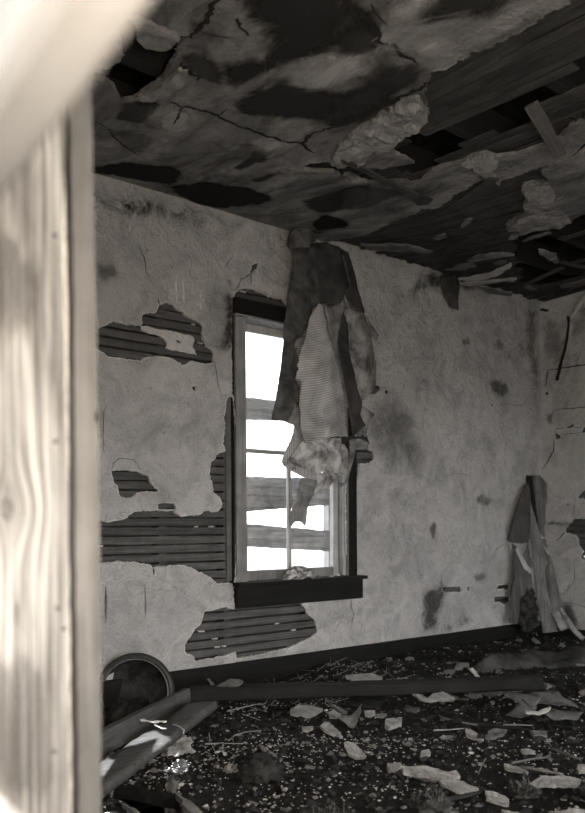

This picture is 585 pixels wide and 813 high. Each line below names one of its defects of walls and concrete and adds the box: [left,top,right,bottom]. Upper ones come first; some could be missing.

crack [189,0,250,39]
water stain [183,0,422,127]
crack [348,3,418,64]
crack [380,82,429,105]
flaking render [419,0,585,136]
crack [138,102,362,153]
flaking render [307,121,544,181]
water stain [93,162,286,208]
water stain [303,186,404,231]
flaking render [335,148,585,302]
flaking render [97,301,318,662]
water stain [423,581,445,629]